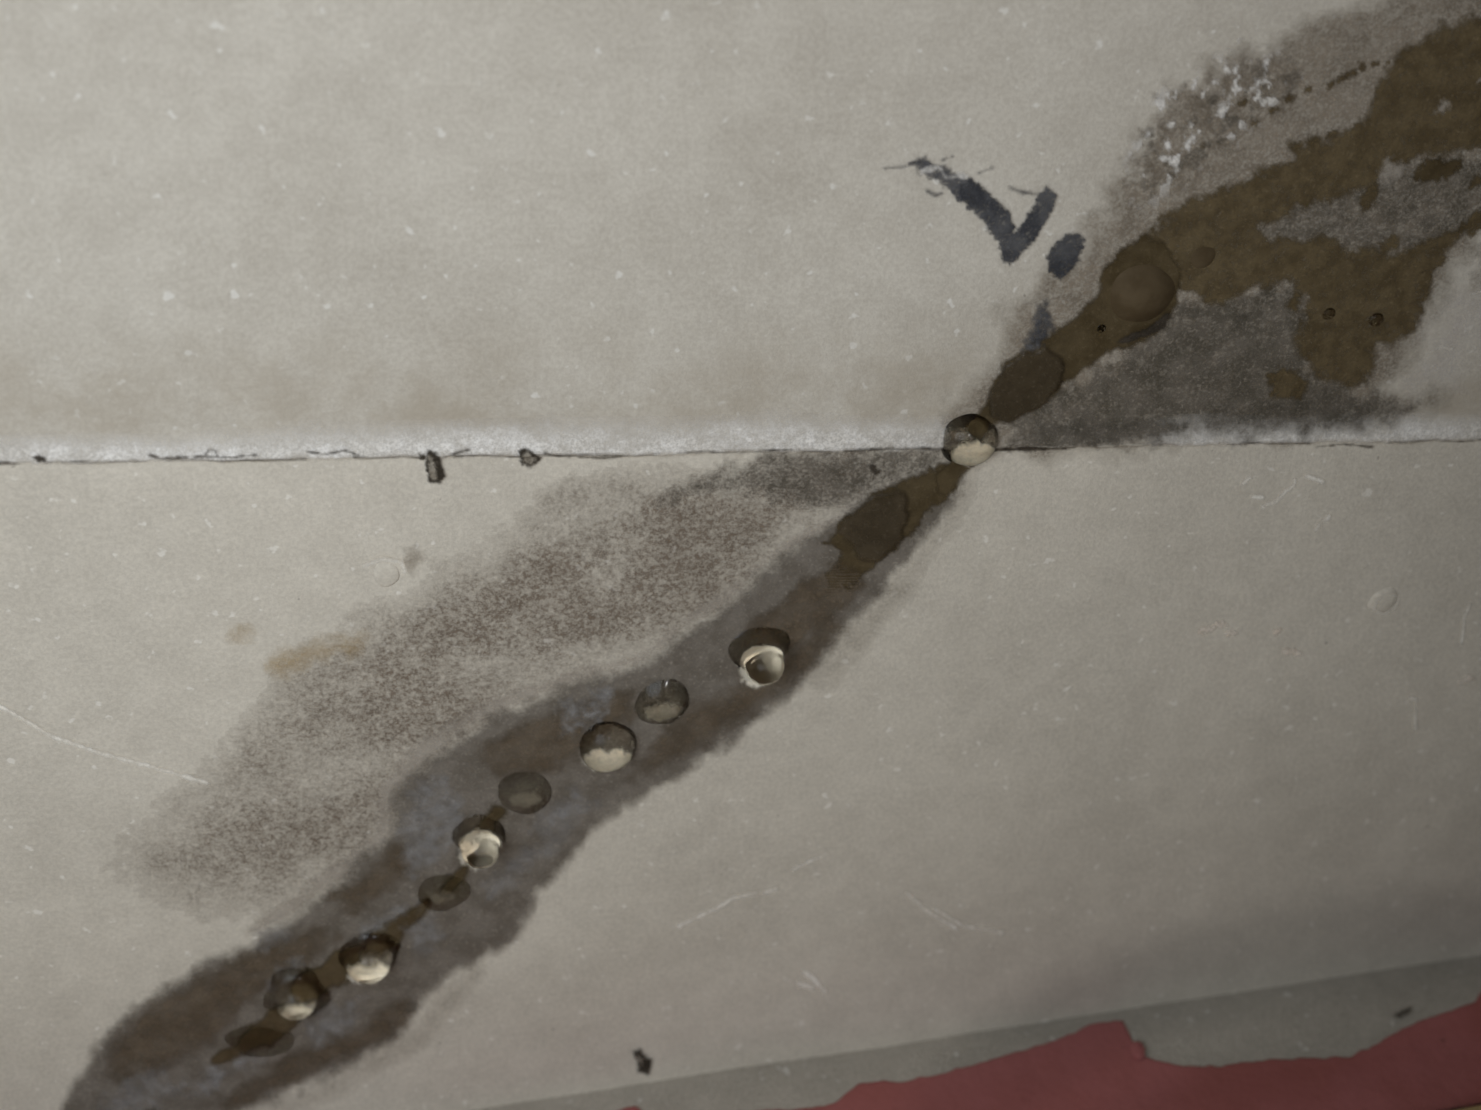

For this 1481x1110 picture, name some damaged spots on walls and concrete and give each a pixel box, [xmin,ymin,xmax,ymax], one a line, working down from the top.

water stain [953,0,1481,455]
water stain [0,421,973,1110]
spalling [634,1050,652,1075]
peeling [774,993,1481,1110]